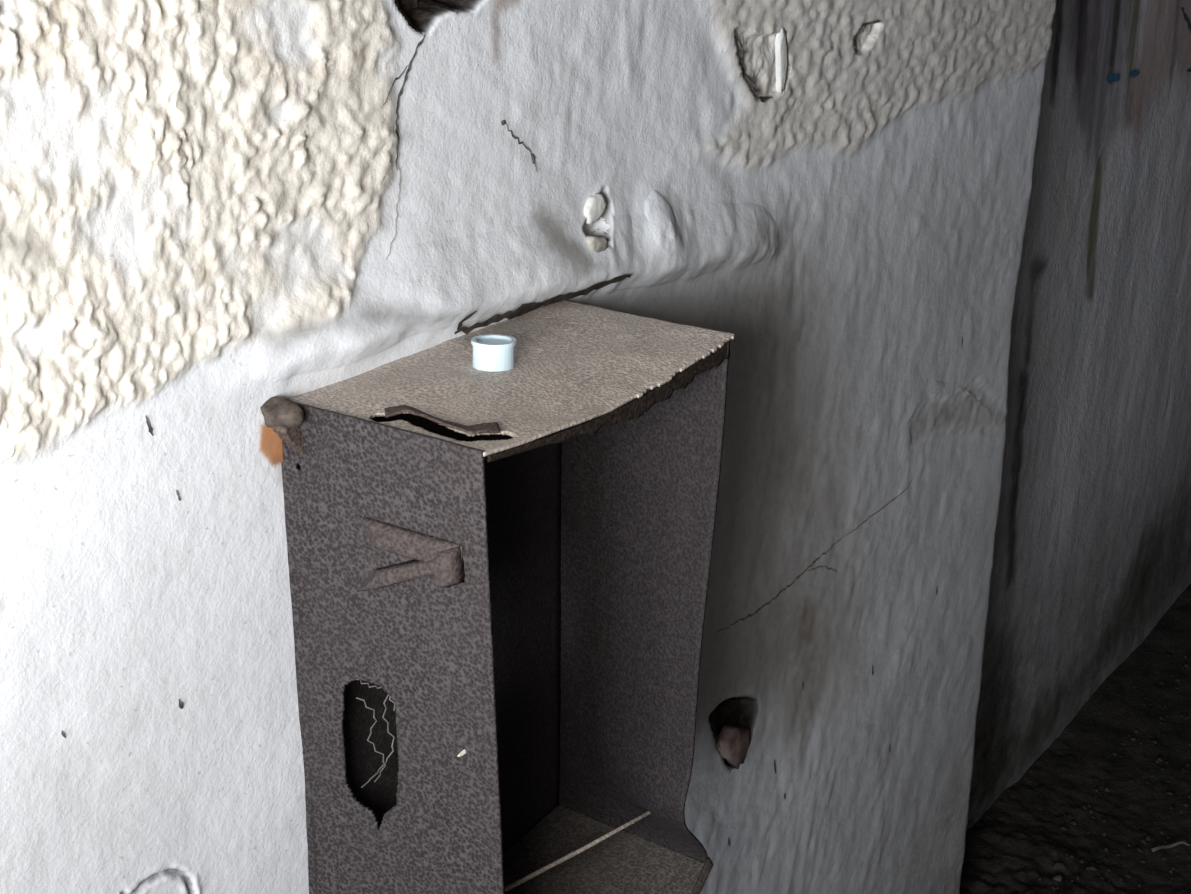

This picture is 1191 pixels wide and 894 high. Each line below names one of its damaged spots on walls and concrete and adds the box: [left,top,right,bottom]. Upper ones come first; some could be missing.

spalling [395,0,478,32]
peeling [734,27,792,103]
leakage [1052,0,1139,298]
crack [716,481,911,633]
spalling [709,697,758,769]